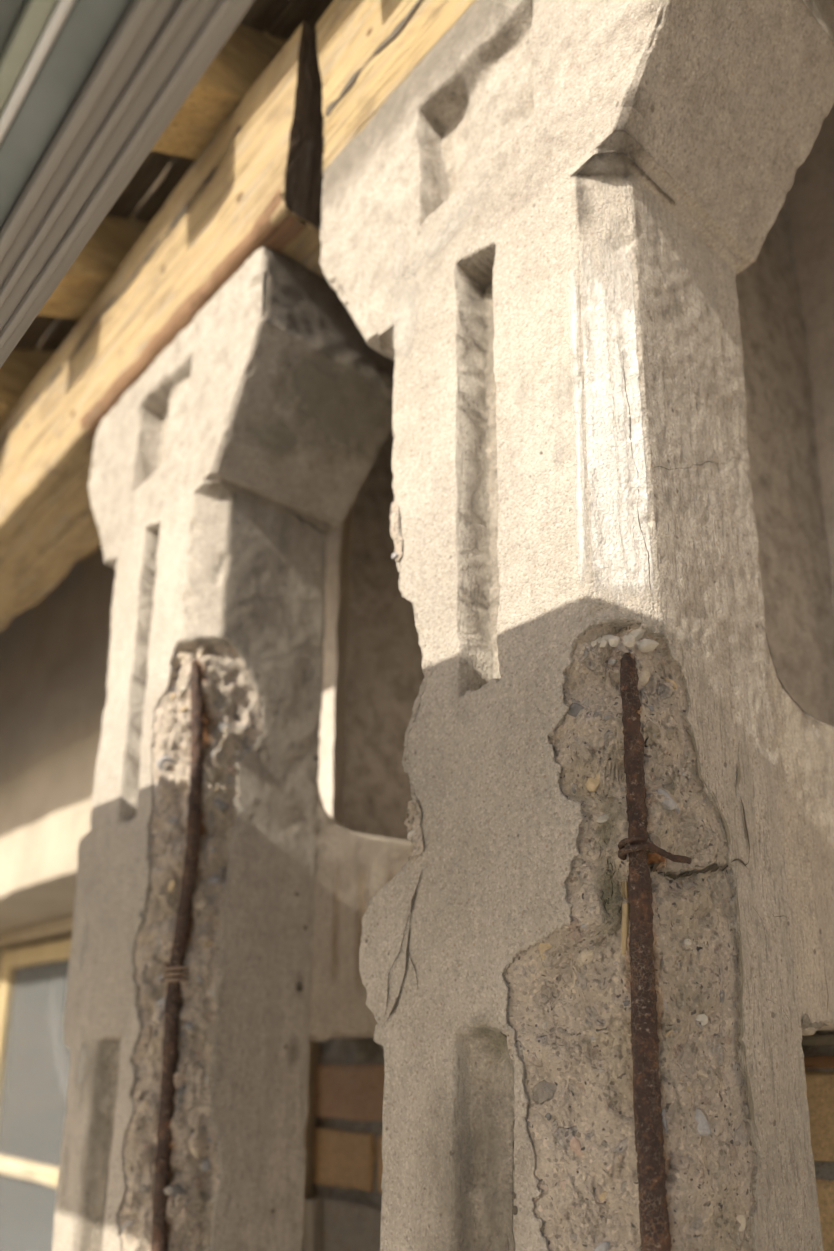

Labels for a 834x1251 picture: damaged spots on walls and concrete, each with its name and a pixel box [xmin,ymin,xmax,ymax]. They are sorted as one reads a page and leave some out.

spalling [119,642,265,1251]
spalling [343,430,424,842]
crack [382,872,422,1026]
spalling [503,623,761,1251]
crack [618,349,744,607]
crack [648,741,750,880]